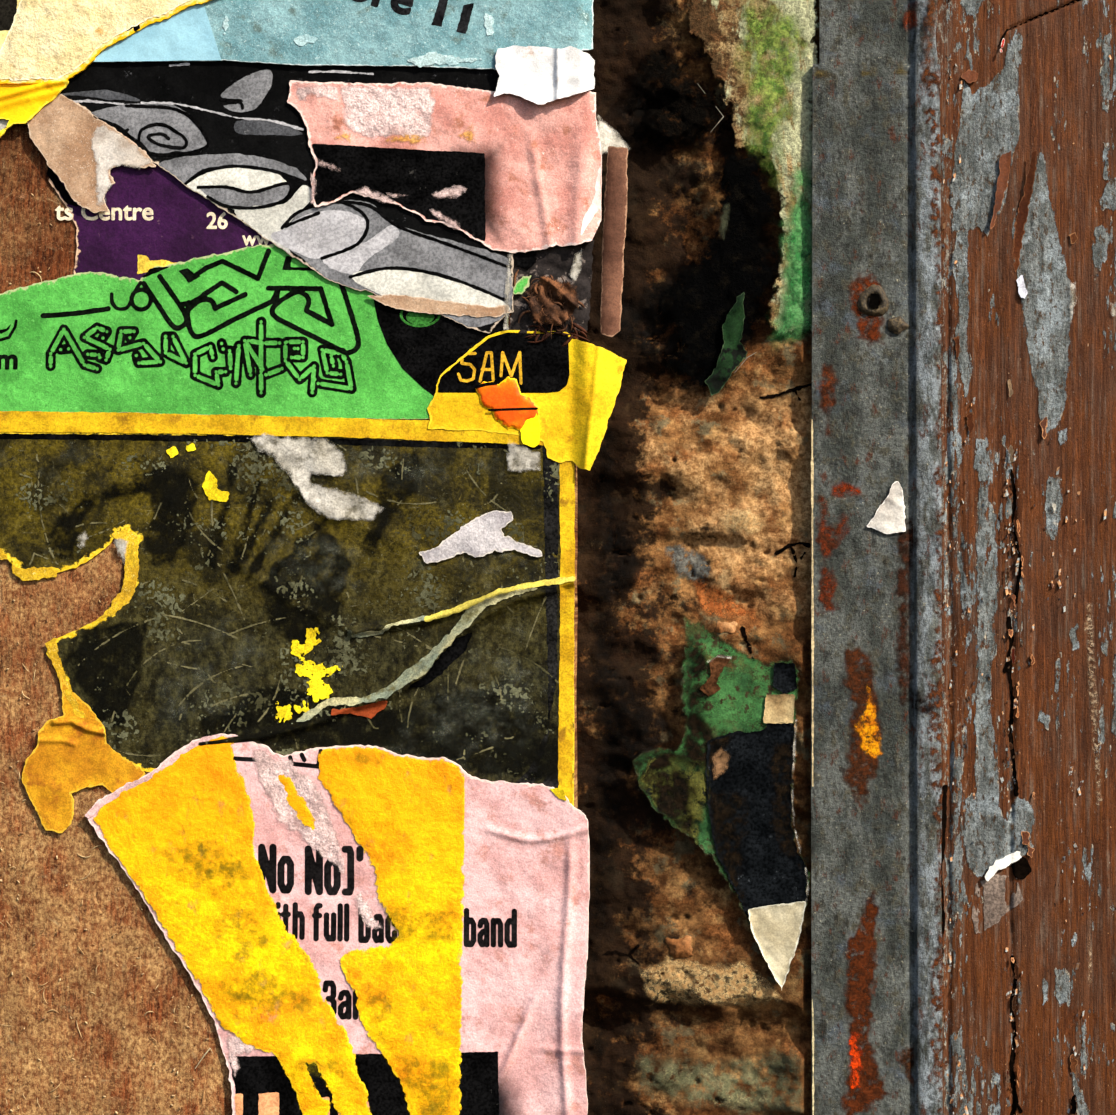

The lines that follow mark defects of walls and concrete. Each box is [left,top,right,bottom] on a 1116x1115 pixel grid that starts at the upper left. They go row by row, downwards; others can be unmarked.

rust [903,0,943,294]
peeling [1093,33,1112,113]
peeling [1092,225,1116,283]
peeling [1100,143,1116,211]
rust [816,483,861,611]
rust [844,648,882,801]
rust [895,469,948,1092]
peeling [941,29,1080,934]
crack [1002,469,1035,799]
peeling [1057,604,1102,805]
rust [842,897,888,1115]
crack [1006,955,1023,1115]